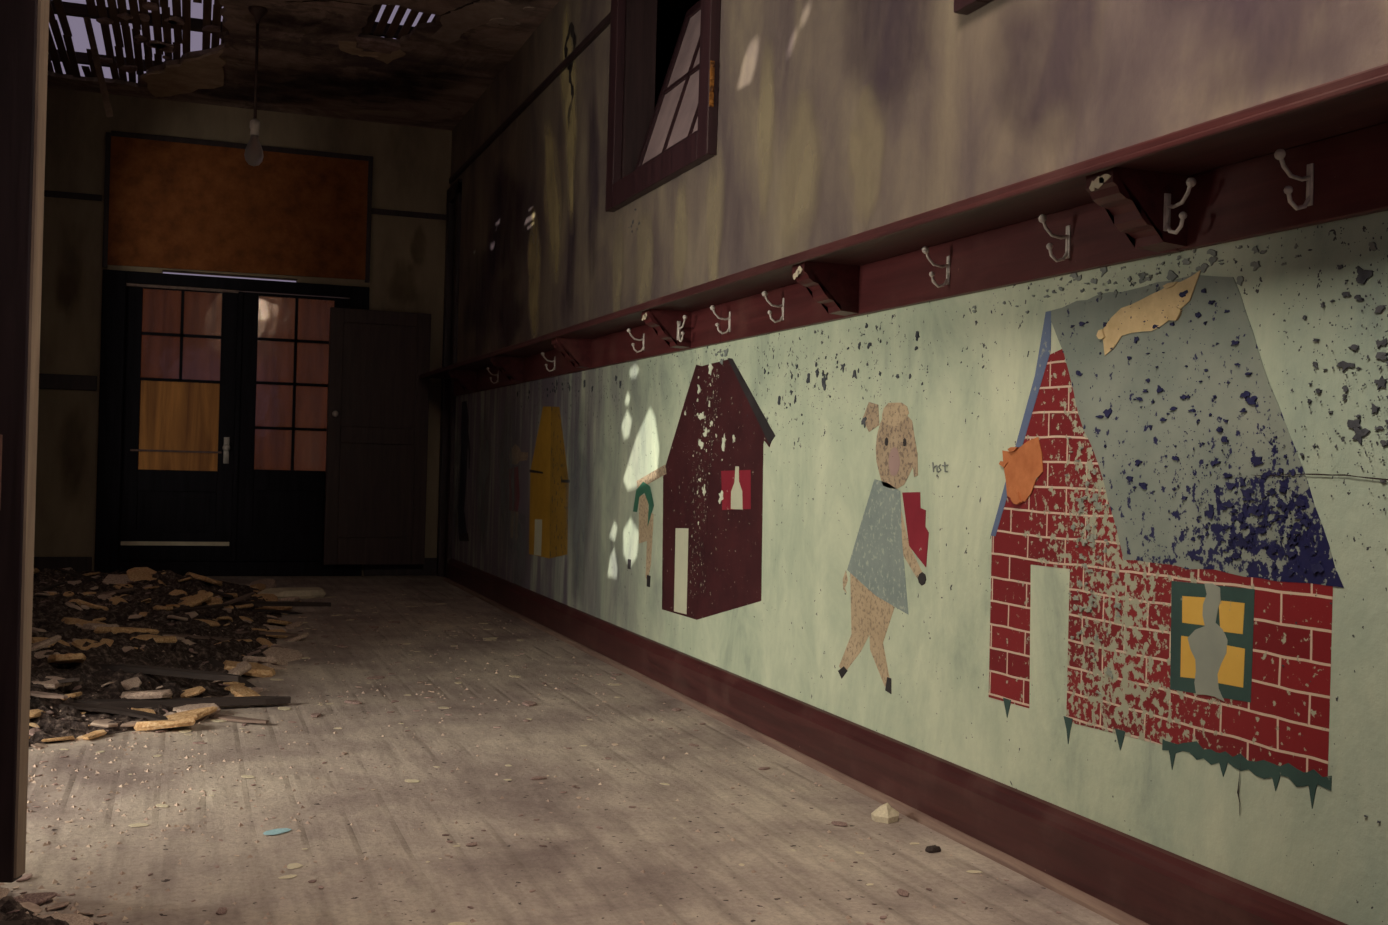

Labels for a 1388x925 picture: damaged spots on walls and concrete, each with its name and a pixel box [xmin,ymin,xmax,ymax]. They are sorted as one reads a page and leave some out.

spalling [956,219,1388,703]